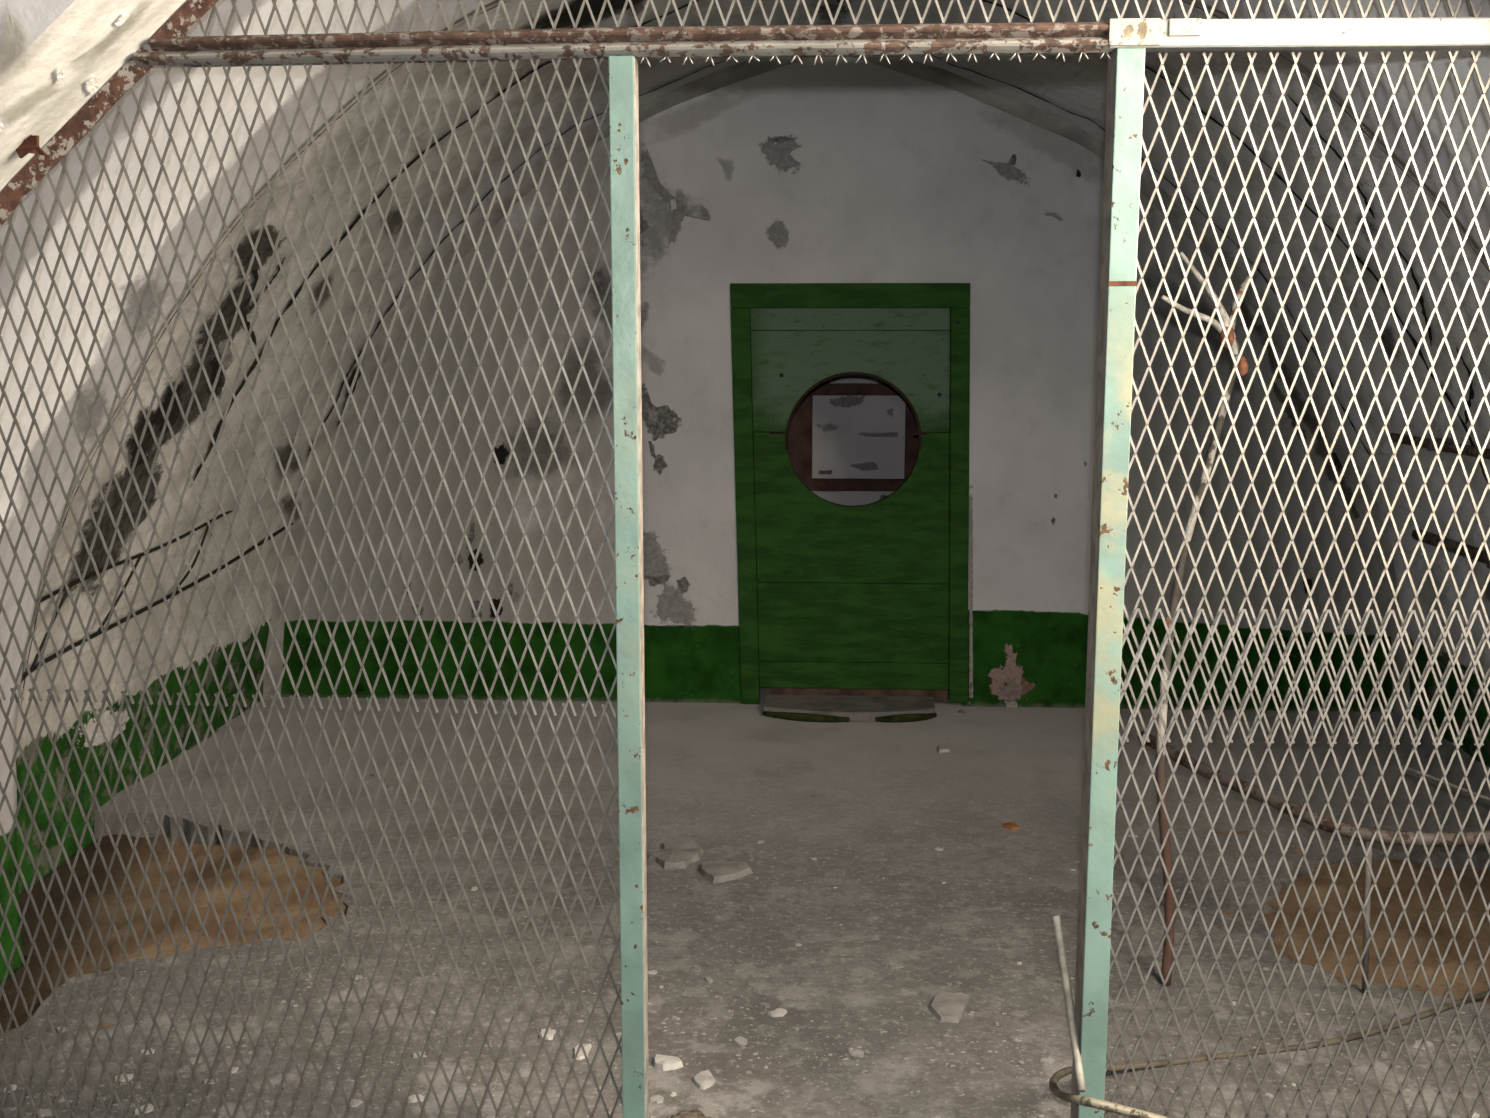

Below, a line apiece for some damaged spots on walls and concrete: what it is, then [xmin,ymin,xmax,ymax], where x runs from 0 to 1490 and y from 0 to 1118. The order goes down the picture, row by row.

rust [16,135,48,158]
flaking render [641,150,711,247]
peeling [766,220,789,248]
peeling [759,135,801,174]
flaking render [984,154,1027,184]
flaking render [641,384,682,475]
flaking render [643,531,695,626]
flaking render [969,486,1036,708]